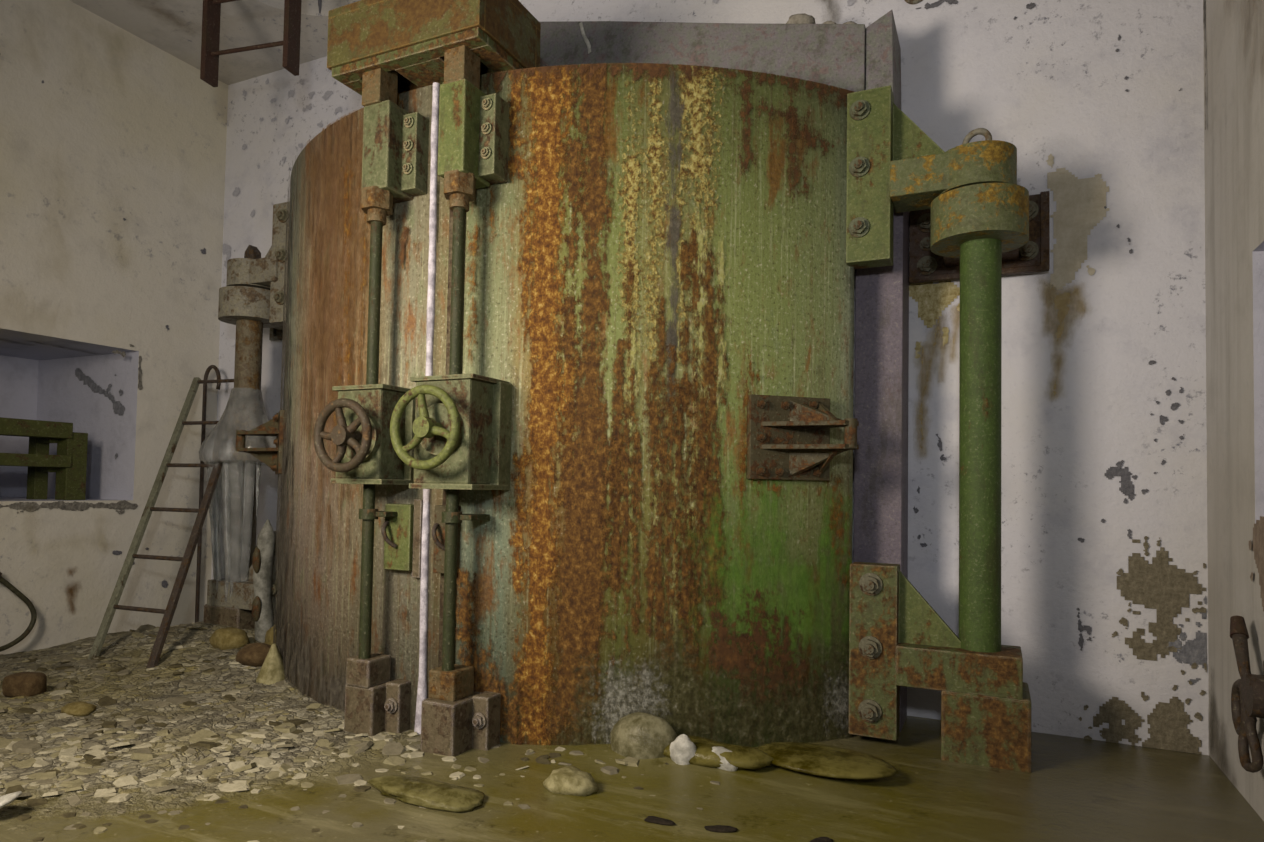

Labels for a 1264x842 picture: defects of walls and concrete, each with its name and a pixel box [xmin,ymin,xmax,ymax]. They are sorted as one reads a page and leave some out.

peeling [108,344,143,390]
peeling [75,368,125,415]
peeling [1105,460,1149,503]
peeling [1079,529,1207,754]